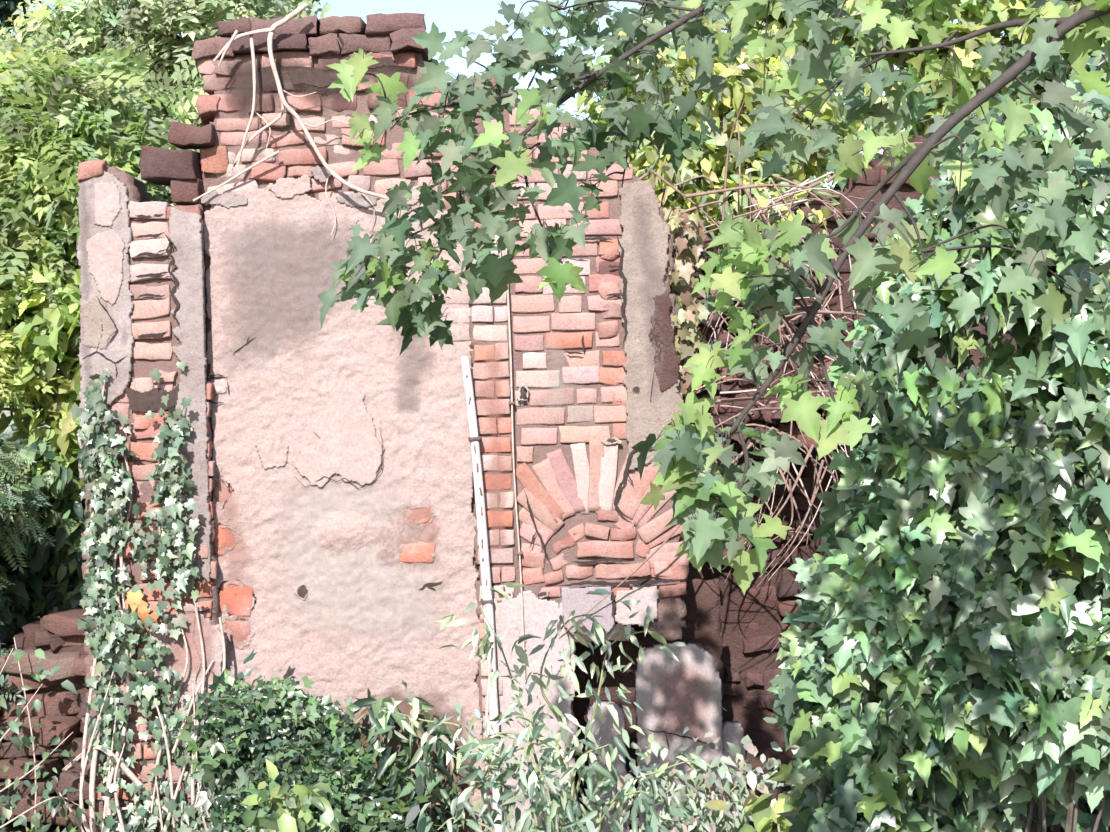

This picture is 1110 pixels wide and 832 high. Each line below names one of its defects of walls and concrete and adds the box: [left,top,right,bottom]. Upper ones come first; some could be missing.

flaking render [197,51,465,209]
spalling [648,292,680,392]
peeling [255,389,384,489]
spalling [209,469,233,510]
spalling [213,524,243,556]
spalling [381,501,436,568]
spalling [217,580,256,650]